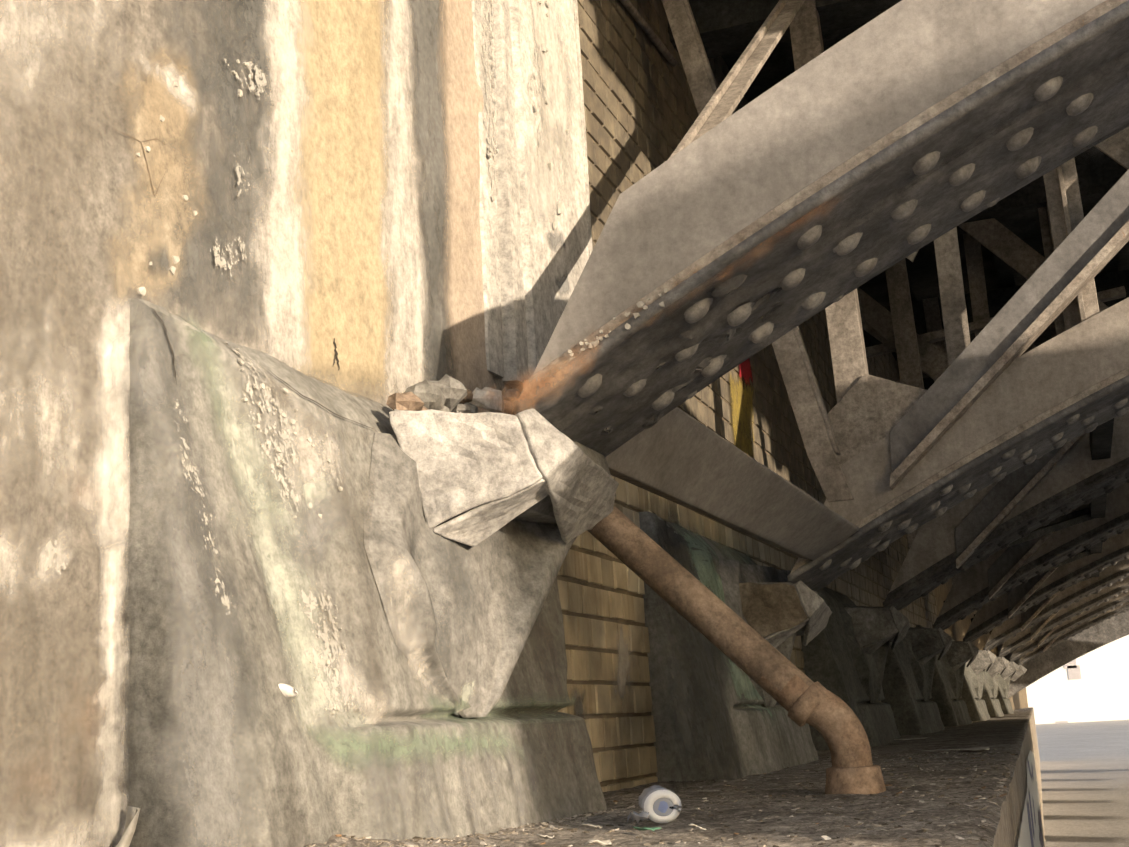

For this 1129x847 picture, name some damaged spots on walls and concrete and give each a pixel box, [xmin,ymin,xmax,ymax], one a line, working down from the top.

crack [150,306,177,384]
peeling [214,327,343,536]
crack [265,367,373,429]
water stain [167,0,494,728]
spalling [386,374,521,421]
rust [511,356,586,405]